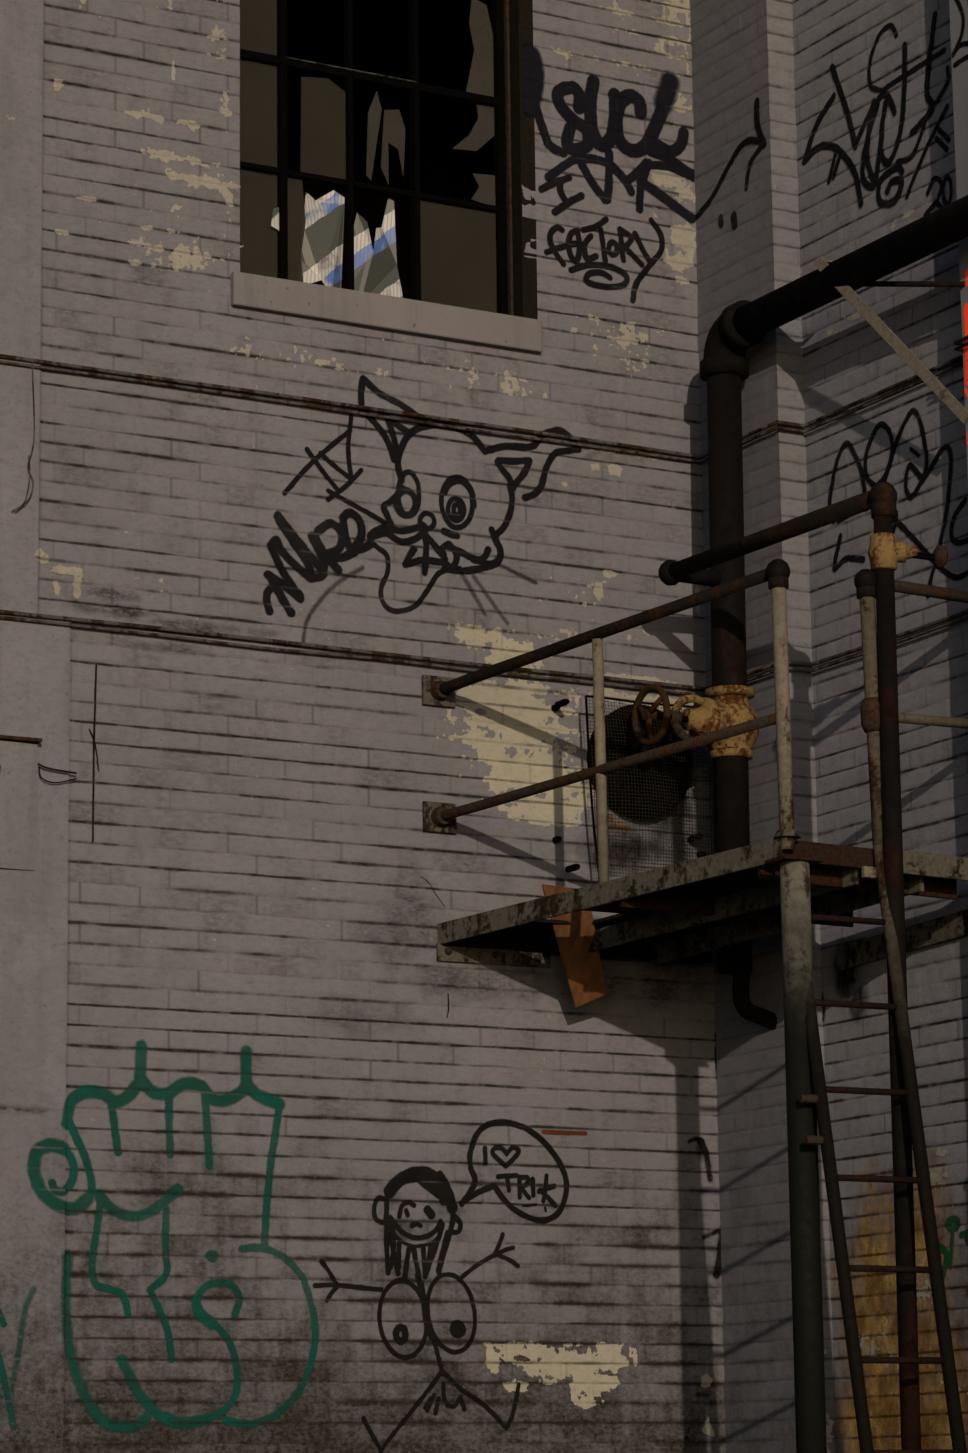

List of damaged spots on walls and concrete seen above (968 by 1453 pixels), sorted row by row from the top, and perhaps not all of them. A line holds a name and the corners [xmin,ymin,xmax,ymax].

peeling [124,108,201,132]
peeling [127,147,243,283]
peeling [230,336,393,377]
peeling [424,359,548,398]
peeling [570,305,664,378]
peeling [436,623,705,827]
corrosion [914,1191,944,1266]
peeling [483,1341,638,1409]
corrosion [848,1224,901,1452]
corrosion [918,1320,968,1449]